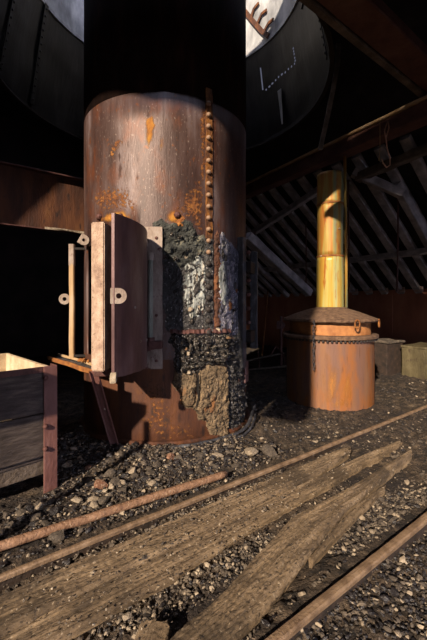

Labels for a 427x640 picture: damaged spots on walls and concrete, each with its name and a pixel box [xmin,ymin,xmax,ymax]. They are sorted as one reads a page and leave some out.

corrosion [95,187,134,221]
corrosion [146,115,155,143]
corrosion [168,111,206,233]
peeling [152,218,206,325]
peeling [216,232,239,339]
peeling [172,355,230,436]